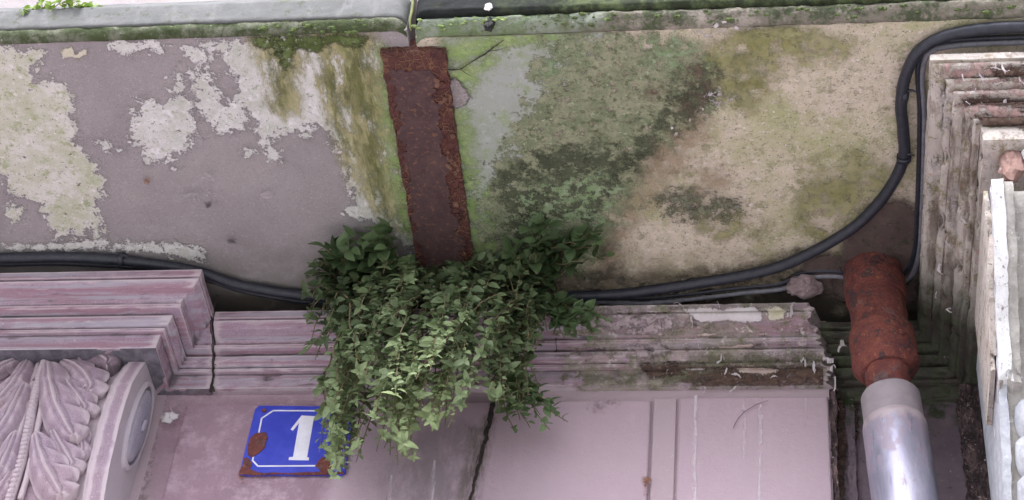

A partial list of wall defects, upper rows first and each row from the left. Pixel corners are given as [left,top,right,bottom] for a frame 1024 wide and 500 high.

peeling [0,34,414,265]
leakage [327,34,412,240]
leakage [442,34,954,328]
crack [209,295,219,393]
crack [469,402,495,500]
flaking render [585,302,860,500]